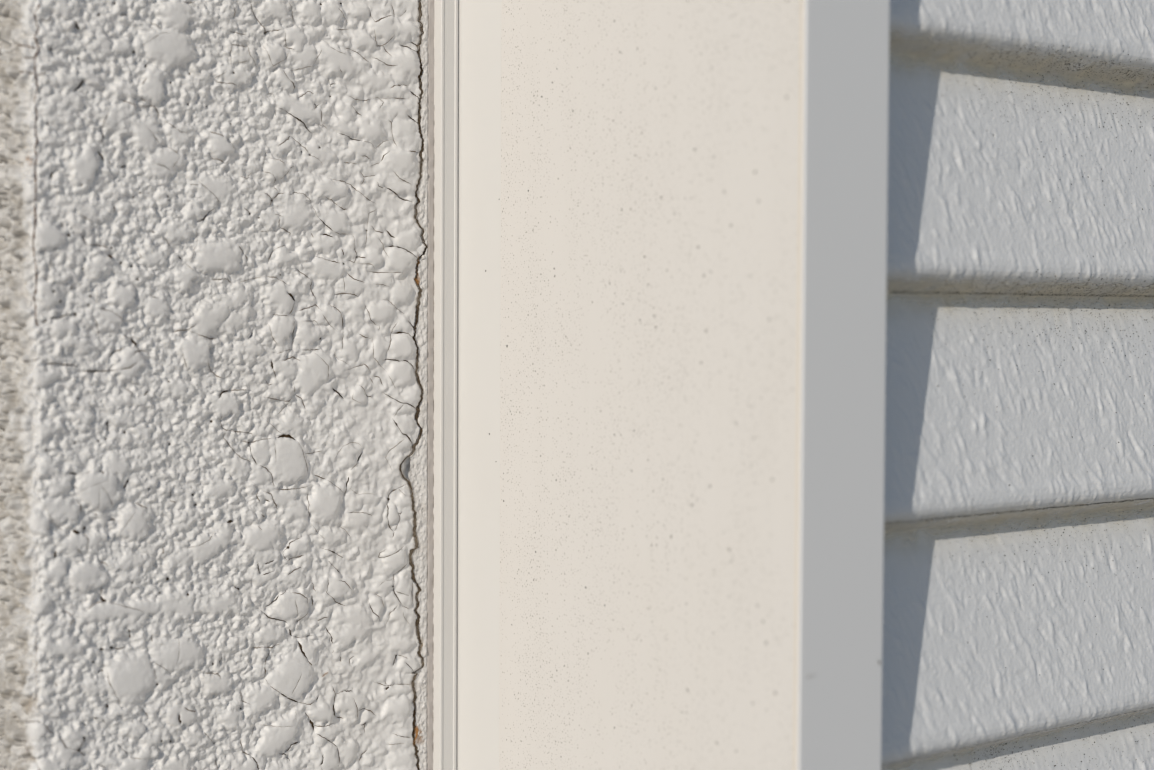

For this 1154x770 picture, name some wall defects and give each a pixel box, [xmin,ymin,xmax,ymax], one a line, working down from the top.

crack [18,5,148,399]
crack [97,0,427,770]
crack [22,470,180,770]